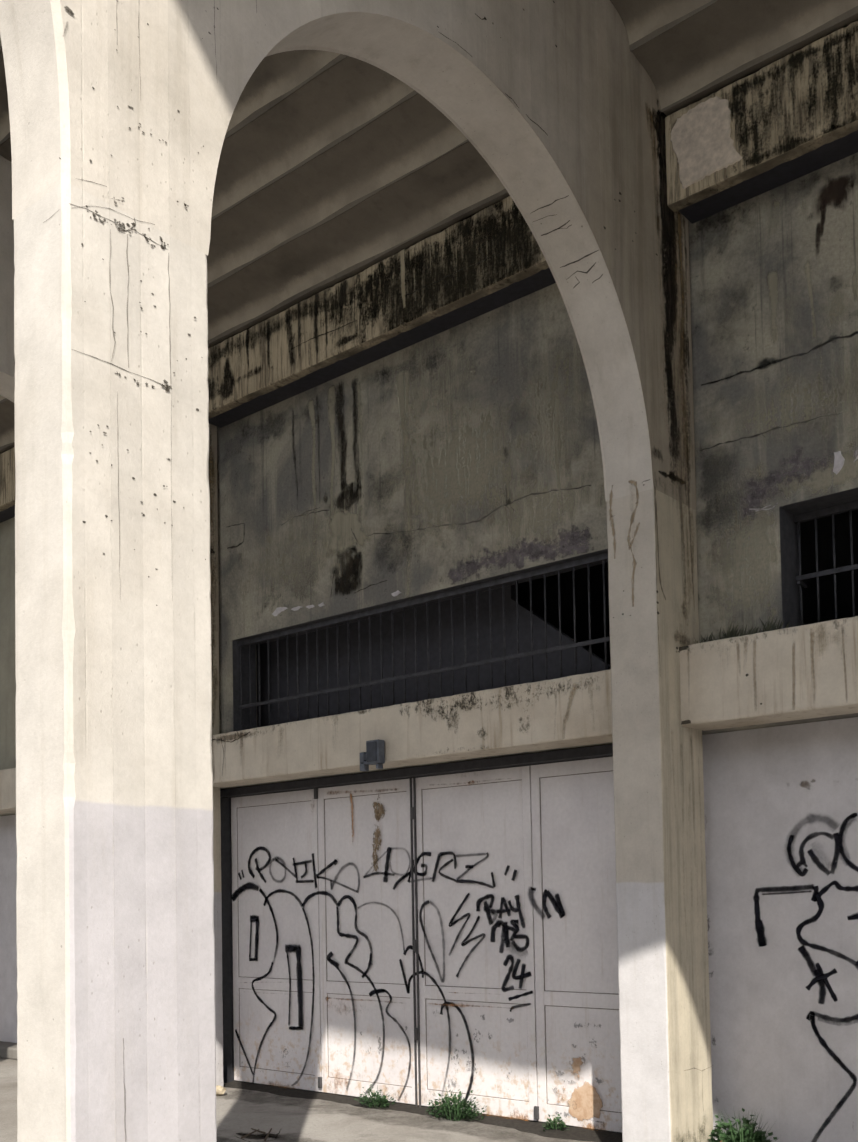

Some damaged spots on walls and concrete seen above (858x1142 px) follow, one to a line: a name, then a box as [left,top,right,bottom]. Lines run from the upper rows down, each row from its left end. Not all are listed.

water stain [722,26,858,165]
crack [69,178,169,250]
water stain [208,201,541,400]
crack [405,195,571,296]
crack [560,250,603,287]
water stain [802,176,857,337]
water stain [646,100,777,644]
crack [701,331,858,386]
water stain [253,348,586,597]
crack [368,485,591,536]
spalling [738,447,858,519]
peeling [554,1044,604,1124]